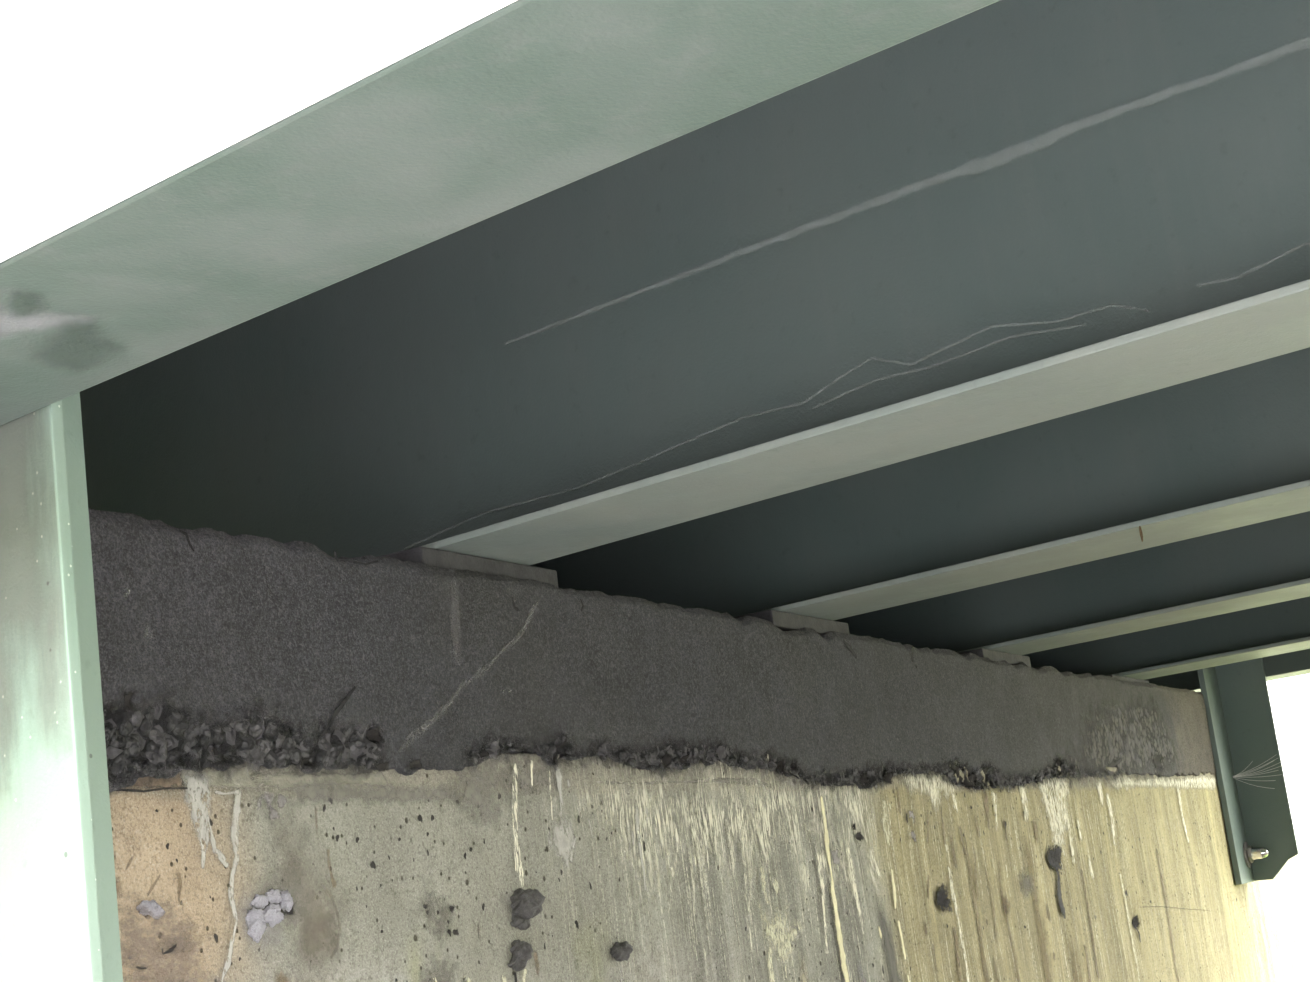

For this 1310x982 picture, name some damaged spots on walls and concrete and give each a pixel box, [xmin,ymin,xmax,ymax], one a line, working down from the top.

crack [399,597,538,750]
spalling [103,692,391,812]